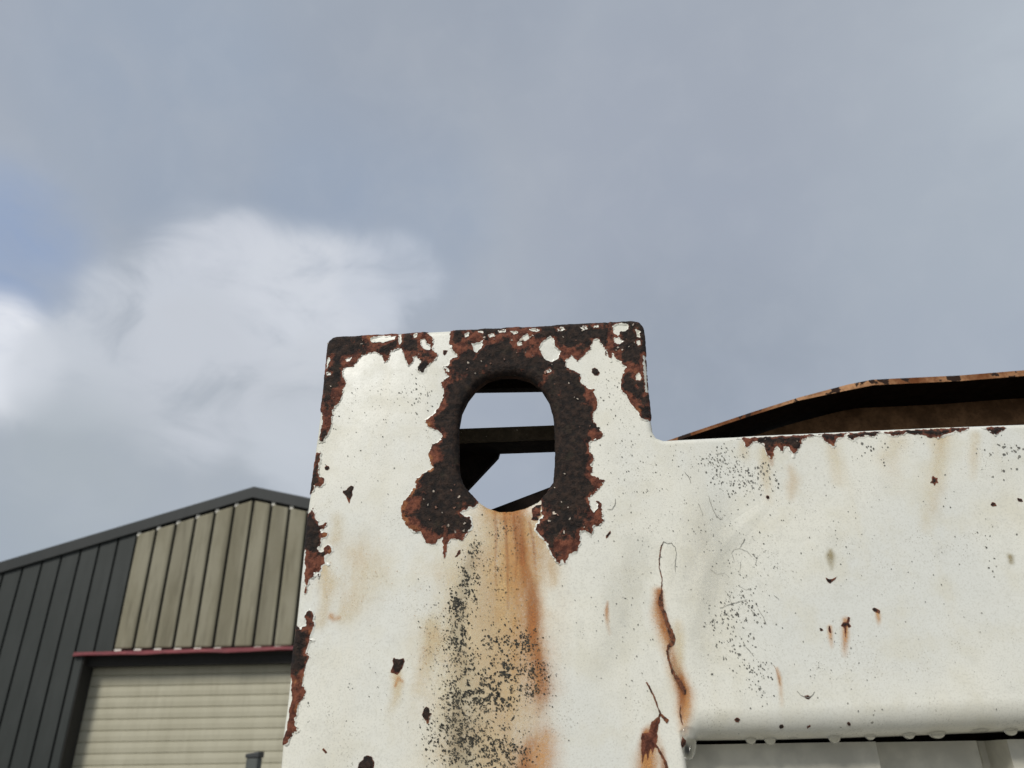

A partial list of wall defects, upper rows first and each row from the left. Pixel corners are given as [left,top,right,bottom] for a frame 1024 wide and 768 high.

corrosion [282,608,316,746]
corrosion [303,321,652,768]
crack [646,541,686,768]
corrosion [736,426,1006,460]